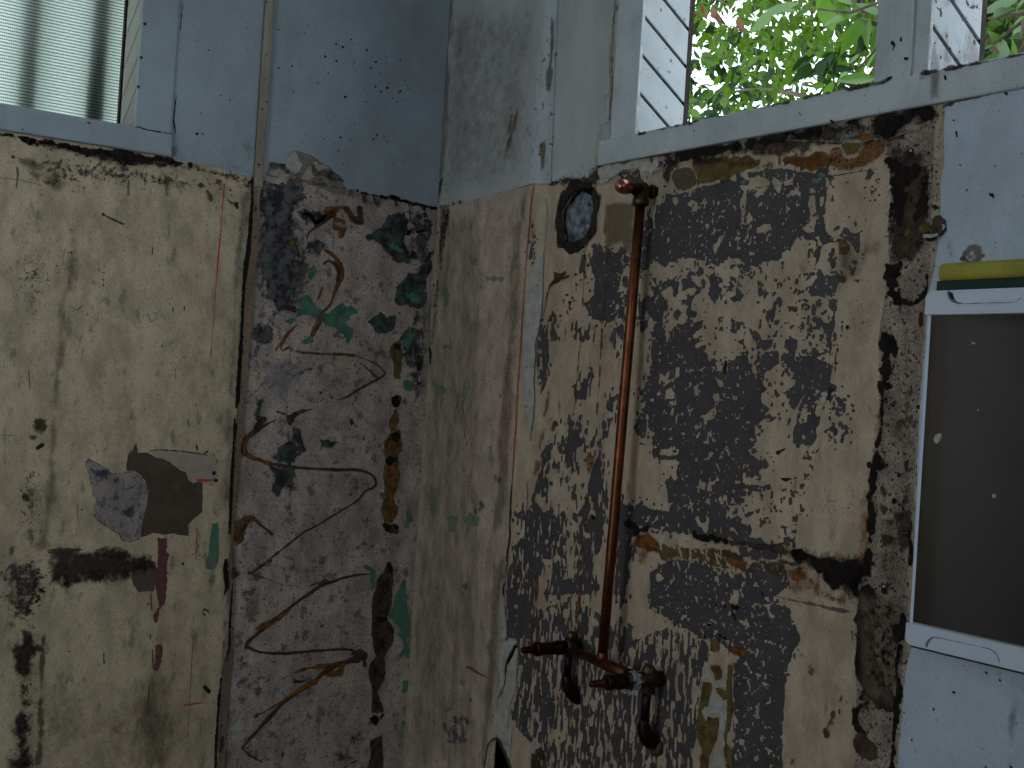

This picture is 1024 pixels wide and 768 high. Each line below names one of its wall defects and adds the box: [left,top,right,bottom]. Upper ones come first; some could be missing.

water stain [0,128,328,357]
peeling [537,293,598,394]
peeling [572,366,594,402]
peeling [609,317,626,358]
peeling [681,222,861,460]
water stain [0,462,156,768]
peeling [85,444,218,542]
peeling [483,579,601,768]
peeling [549,387,619,511]
peeling [614,500,642,610]
peeling [732,473,810,549]
water stain [659,261,928,768]